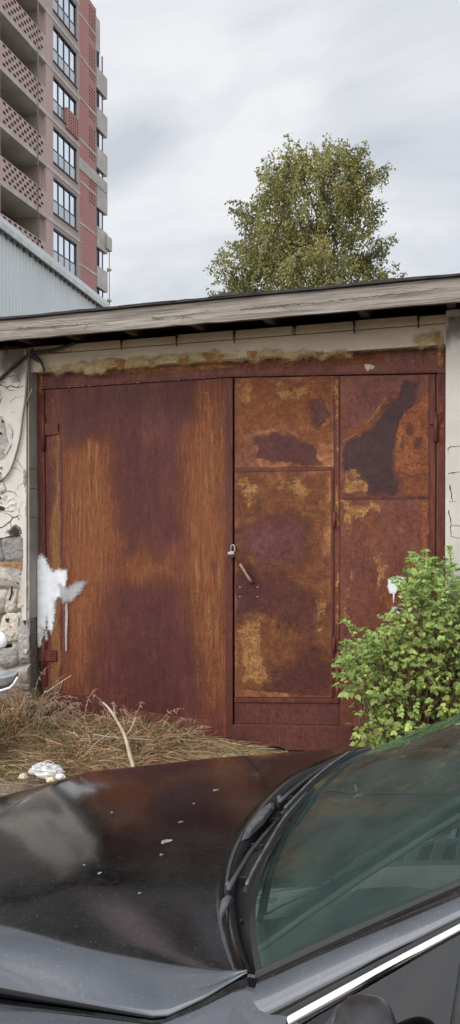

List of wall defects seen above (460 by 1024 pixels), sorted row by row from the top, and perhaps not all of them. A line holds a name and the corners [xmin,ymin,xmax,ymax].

crack [0,462,37,528]
flaking render [1,562,48,656]
rust [38,350,384,705]
rust [312,389,444,689]